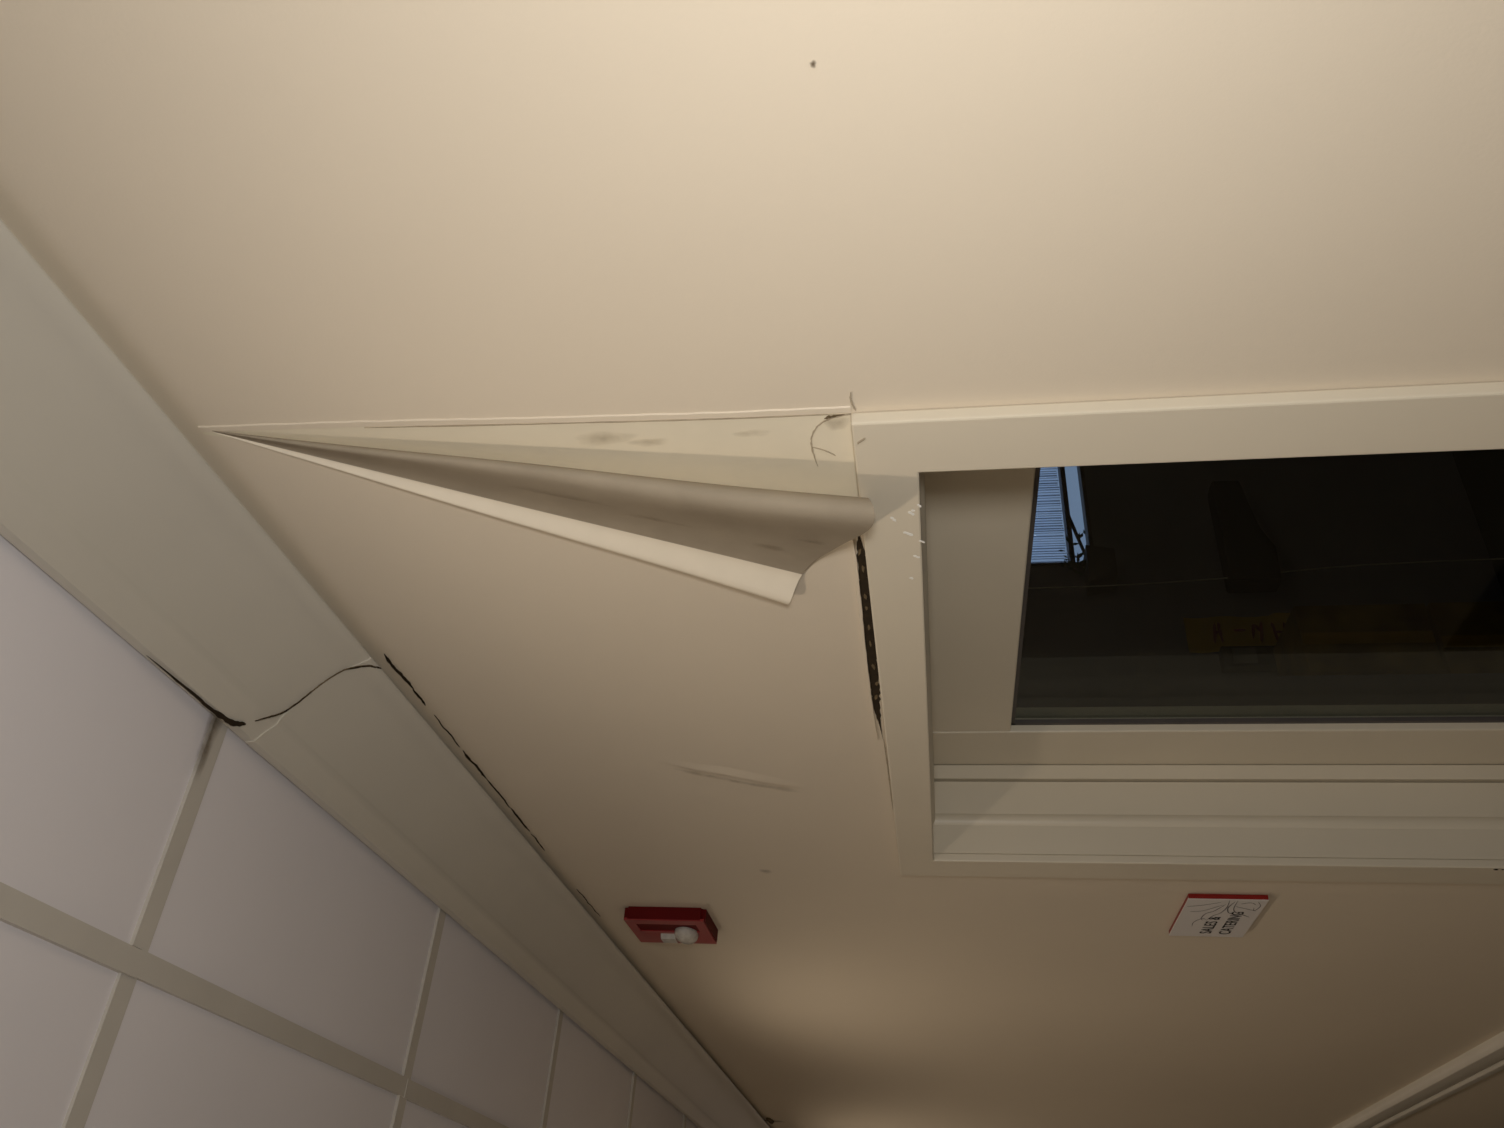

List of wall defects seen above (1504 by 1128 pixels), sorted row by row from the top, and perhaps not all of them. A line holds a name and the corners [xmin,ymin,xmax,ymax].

peeling [203,413,925,604]
crack [255,654,545,851]
crack [851,536,893,808]